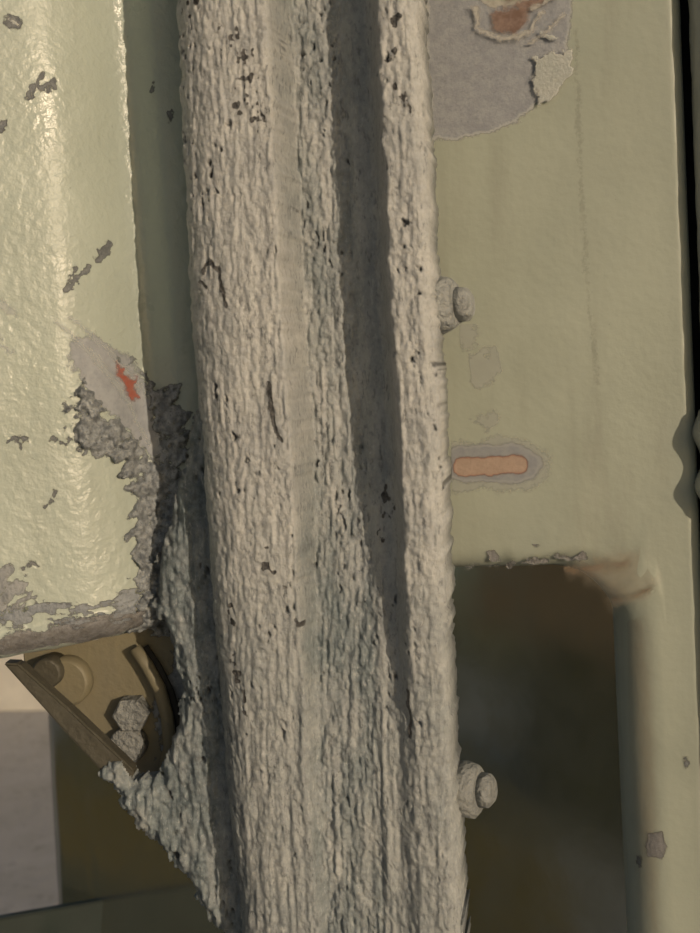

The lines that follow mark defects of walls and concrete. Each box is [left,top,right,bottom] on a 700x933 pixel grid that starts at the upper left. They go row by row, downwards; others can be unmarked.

corrosion [426,0,574,141]
peeling [0,334,193,657]
corrosion [451,435,551,493]
peeling [636,831,667,868]